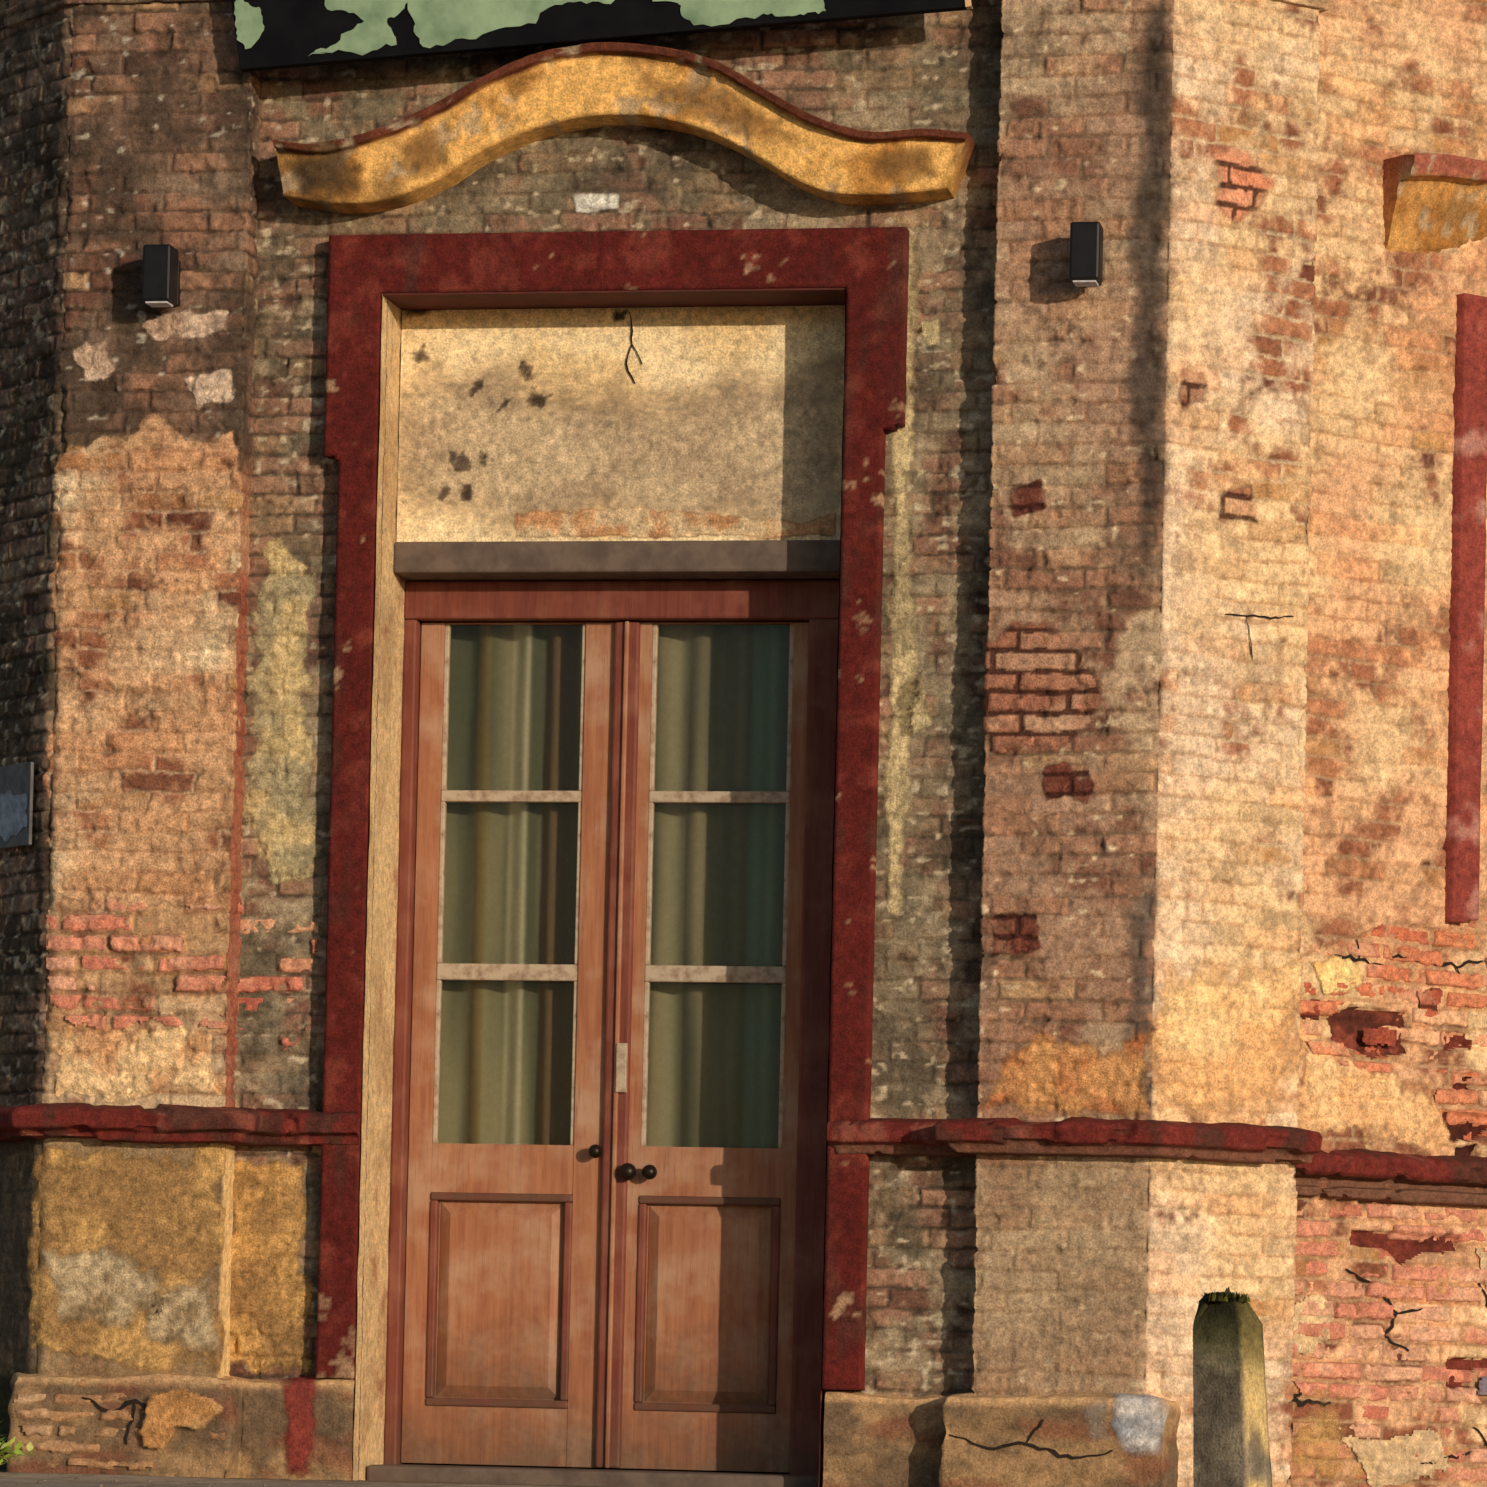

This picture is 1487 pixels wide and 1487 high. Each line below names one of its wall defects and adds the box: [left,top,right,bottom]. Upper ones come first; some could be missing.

crack [625,312,643,384]
flaking render [1010,478,1046,517]
flaking render [982,621,1104,803]
peeling [983,913,1487,1155]
peeling [27,1143,313,1374]
crack [1346,1268,1423,1352]
peeling [140,1389,224,1448]
crack [949,1419,1113,1460]
crack [1420,1427,1487,1465]